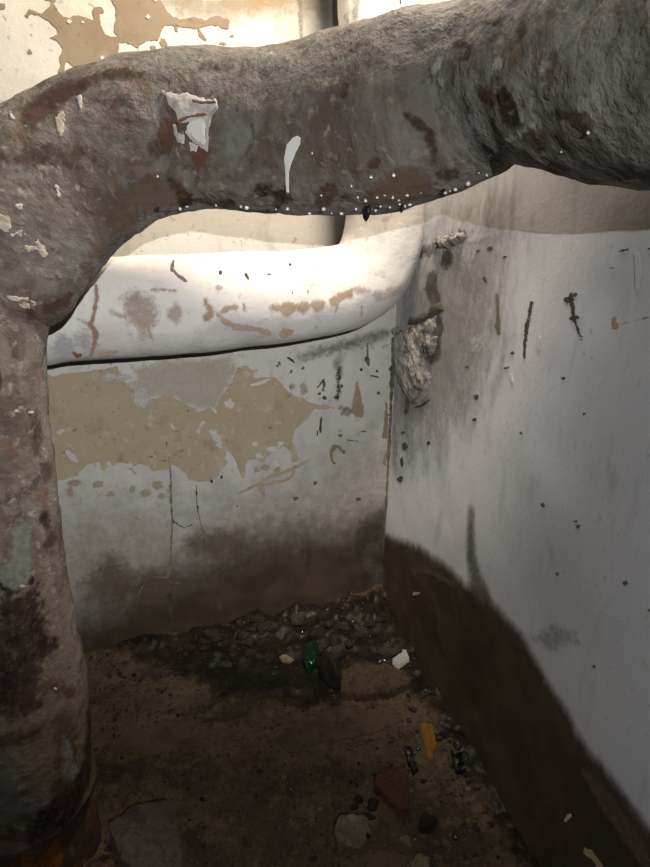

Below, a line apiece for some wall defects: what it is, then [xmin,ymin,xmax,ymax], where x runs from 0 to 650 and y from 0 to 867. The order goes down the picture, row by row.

peeling [25,0,234,73]
peeling [55,111,66,137]
peeling [0,188,35,210]
peeling [0,214,48,257]
peeling [7,296,36,309]
peeling [47,365,335,499]
peeling [330,434,345,464]
damp [78,486,650,867]